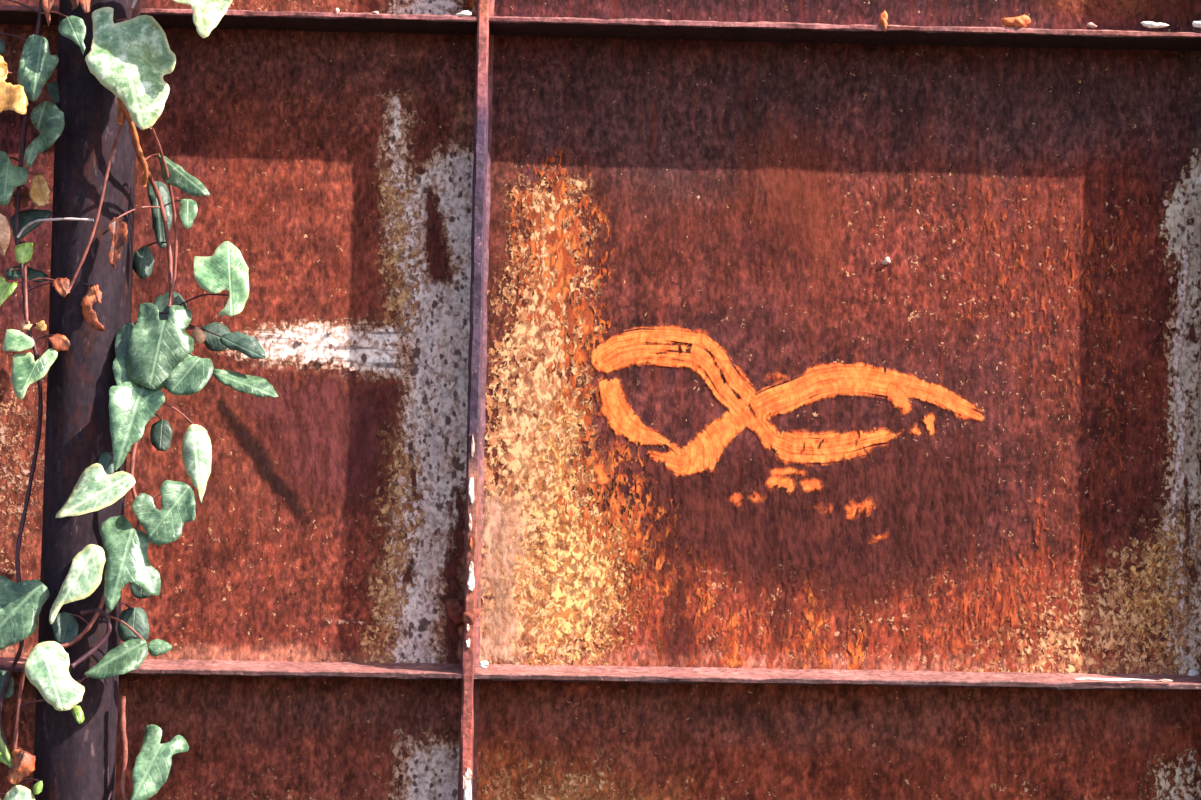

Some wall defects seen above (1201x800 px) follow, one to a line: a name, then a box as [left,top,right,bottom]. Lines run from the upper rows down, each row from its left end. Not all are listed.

peeling [372,0,477,16]
rust [879,11,888,30]
rust [1001,15,1031,28]
rust [918,187,1167,482]
peeling [222,91,475,664]
rust [441,151,867,670]
peeling [1074,147,1201,682]
rust [883,496,1201,675]
peeling [387,729,472,800]
rust [476,755,644,800]
peeling [1146,747,1201,800]